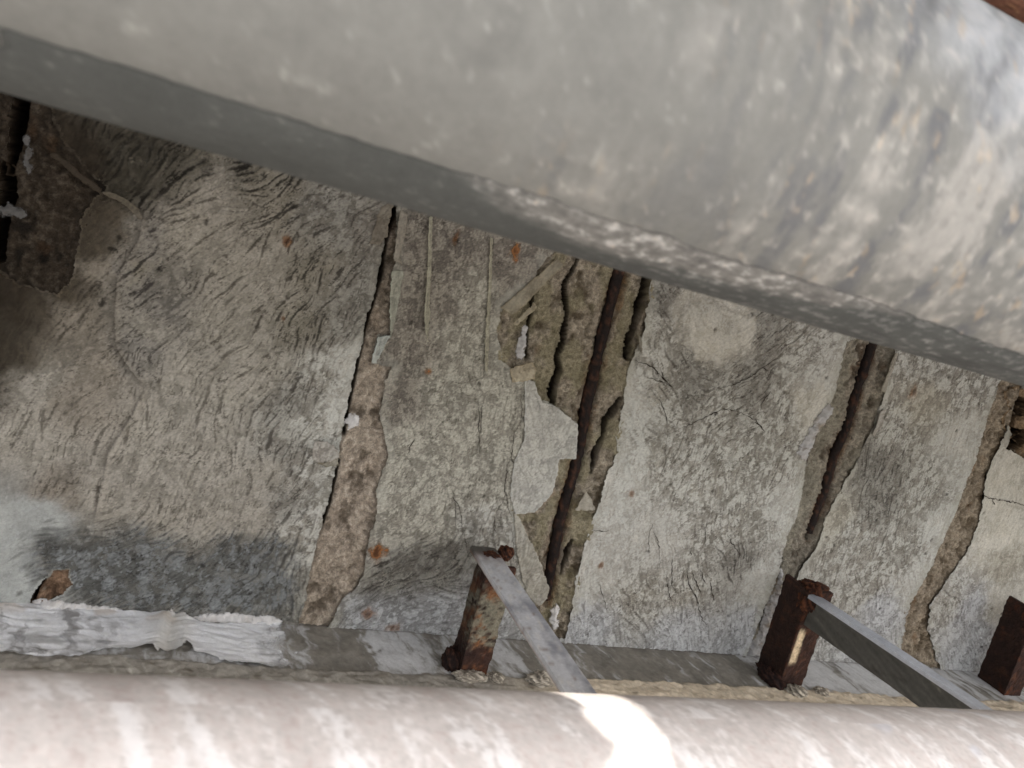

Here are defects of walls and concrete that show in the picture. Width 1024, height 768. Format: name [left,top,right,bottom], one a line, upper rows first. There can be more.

spalling [0,92,143,295]
spalling [299,204,408,626]
spalling [484,237,655,639]
crack [622,276,782,432]
spalling [765,338,898,605]
spalling [901,380,1024,669]